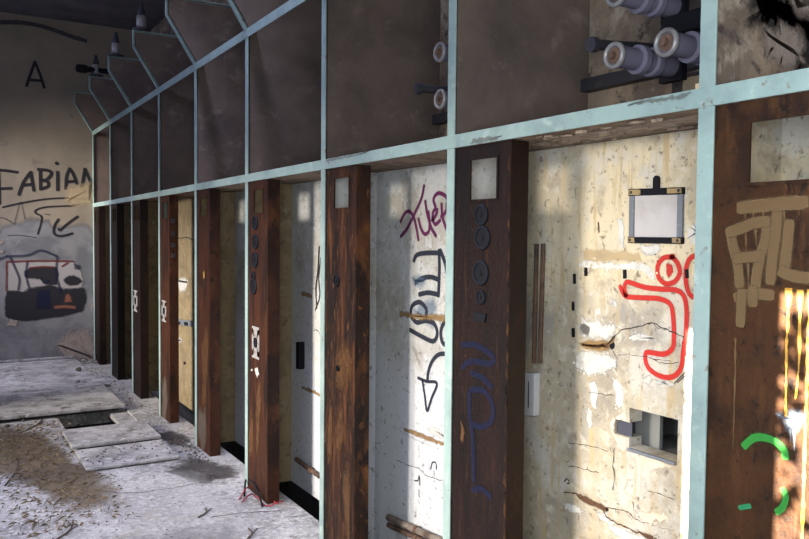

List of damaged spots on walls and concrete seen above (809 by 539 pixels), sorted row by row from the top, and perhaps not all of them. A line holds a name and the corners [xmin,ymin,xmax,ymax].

peeling [629,332,654,342]
crack [611,322,685,372]
peeling [573,308,628,452]
peeling [642,376,674,387]
spalling [635,454,676,470]
crack [564,443,688,539]